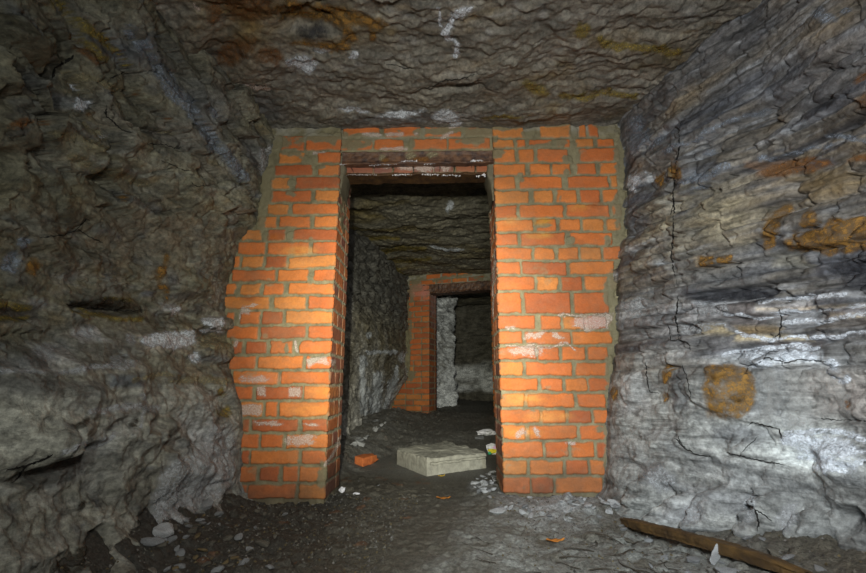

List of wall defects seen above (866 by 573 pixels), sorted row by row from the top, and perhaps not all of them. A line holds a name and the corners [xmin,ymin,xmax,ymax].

crack [668,123,691,399]
water stain [509,331,575,358]
water stain [558,312,612,332]
crack [740,309,832,374]
water stain [242,375,282,426]
water stain [284,424,316,445]
crack [674,422,783,465]
crack [750,497,772,532]